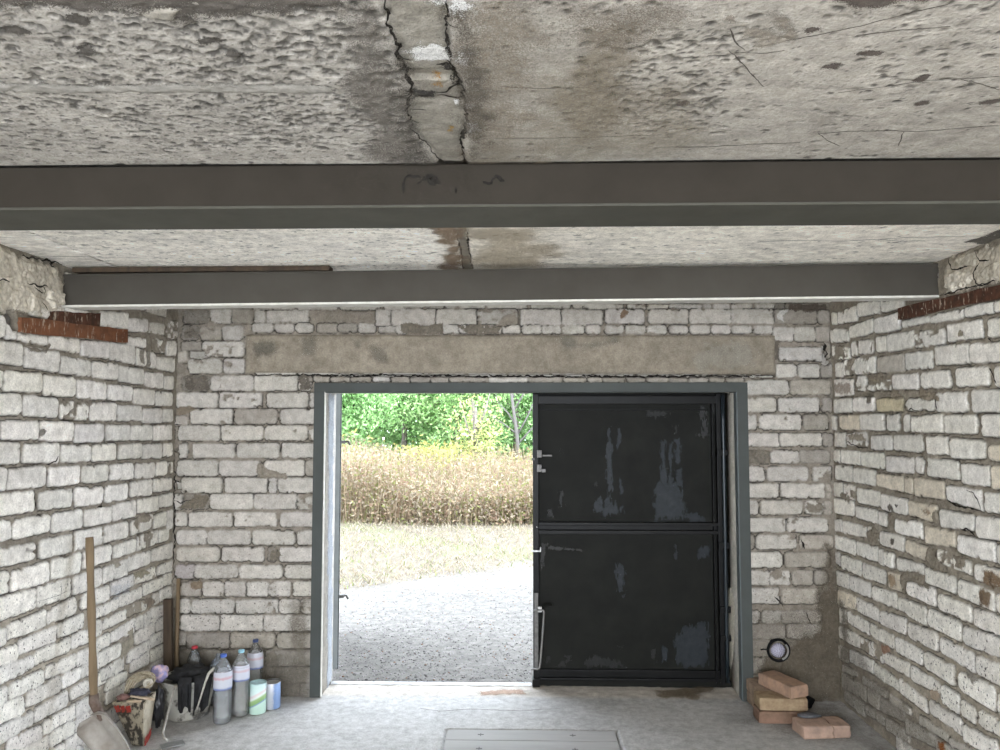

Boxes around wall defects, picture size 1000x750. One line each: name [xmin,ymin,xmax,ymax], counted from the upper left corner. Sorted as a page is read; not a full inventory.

crack [384,0,479,161]
damp [310,0,724,165]
crack [0,255,81,310]
damp [422,227,575,270]
crack [853,236,995,295]